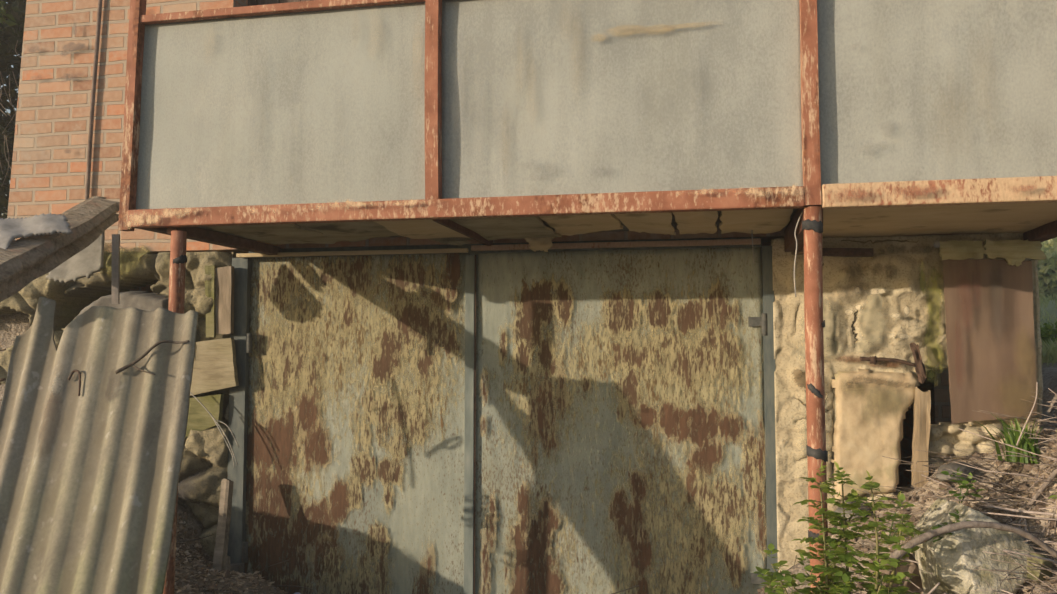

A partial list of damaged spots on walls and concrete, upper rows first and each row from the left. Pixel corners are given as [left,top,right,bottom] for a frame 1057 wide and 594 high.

corrosion [244,253,463,594]
corrosion [479,260,767,594]
crack [834,309,858,348]
corrosion [895,185,937,196]